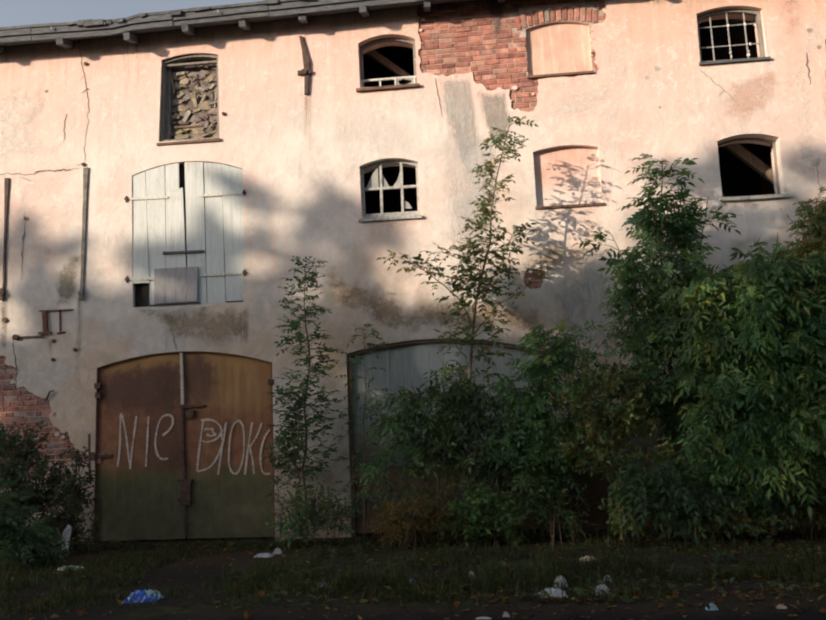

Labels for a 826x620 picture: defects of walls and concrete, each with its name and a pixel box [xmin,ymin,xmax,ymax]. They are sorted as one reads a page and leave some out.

crack [0,40,90,181]
flaking render [415,0,606,112]
damp [330,275,533,328]
flaking render [518,264,551,293]
flaking render [0,356,106,481]